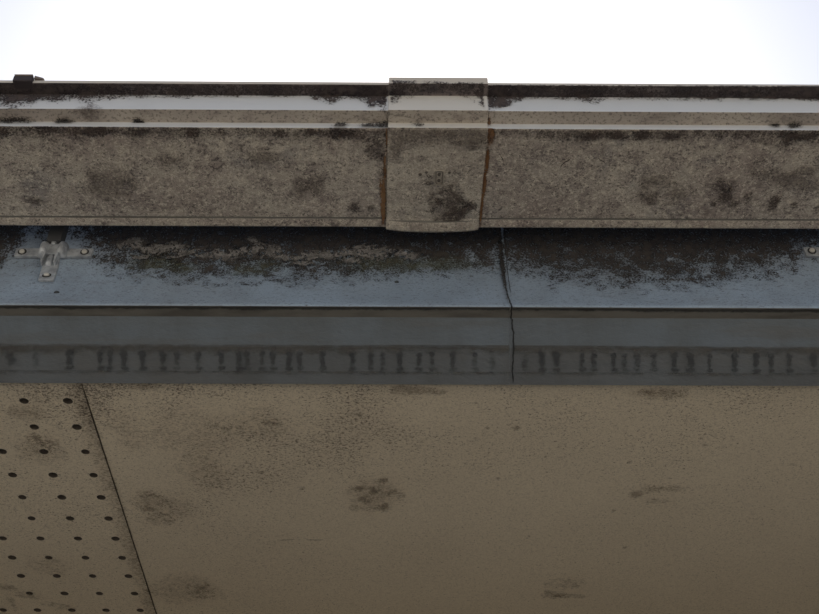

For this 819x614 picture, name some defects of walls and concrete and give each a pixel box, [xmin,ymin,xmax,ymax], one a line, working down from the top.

damp [0,80,819,176]
damp [0,225,50,269]
corrosion [379,128,388,225]
damp [67,226,819,295]
damp [427,185,477,222]
corrosion [479,128,495,225]
crack [500,228,515,381]
damp [767,193,782,212]